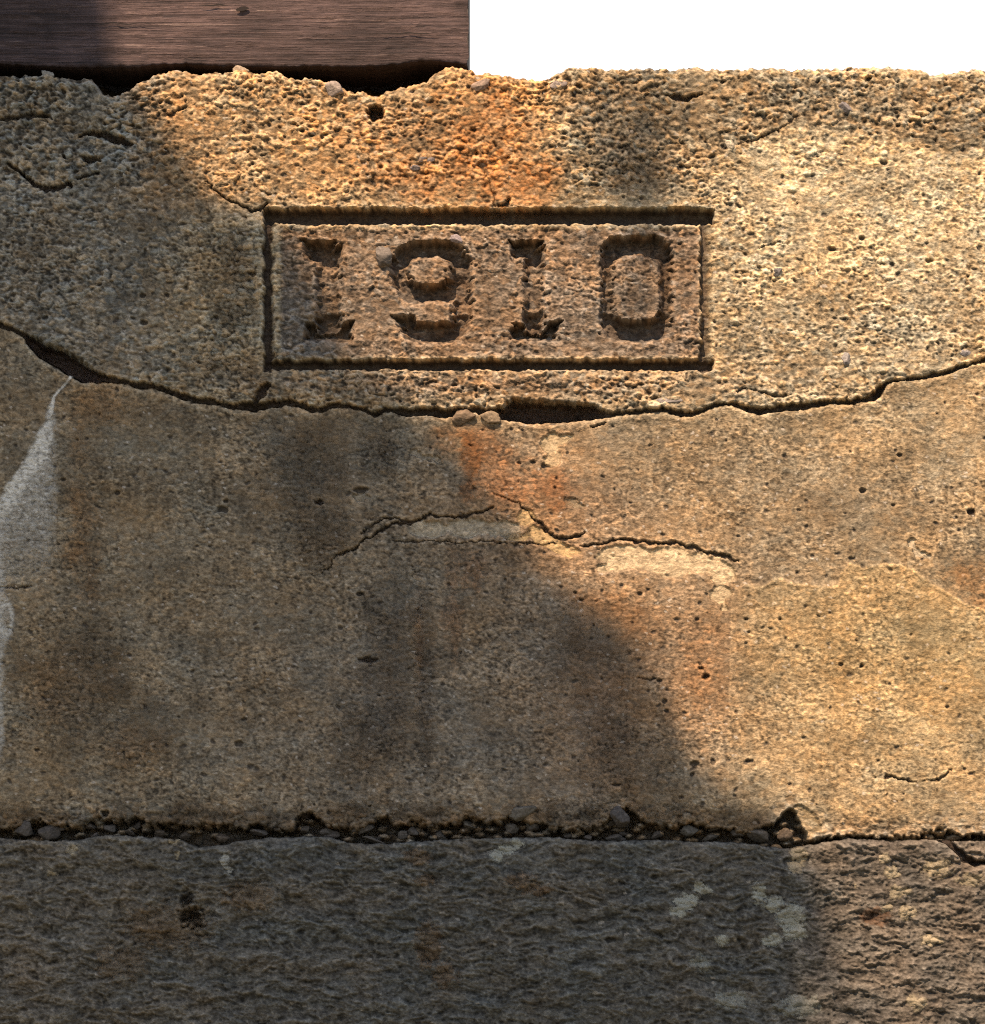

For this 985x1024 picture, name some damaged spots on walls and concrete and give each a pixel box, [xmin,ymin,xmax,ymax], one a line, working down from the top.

crack [0,323,985,428]
damp [0,376,72,637]
crack [323,495,737,572]